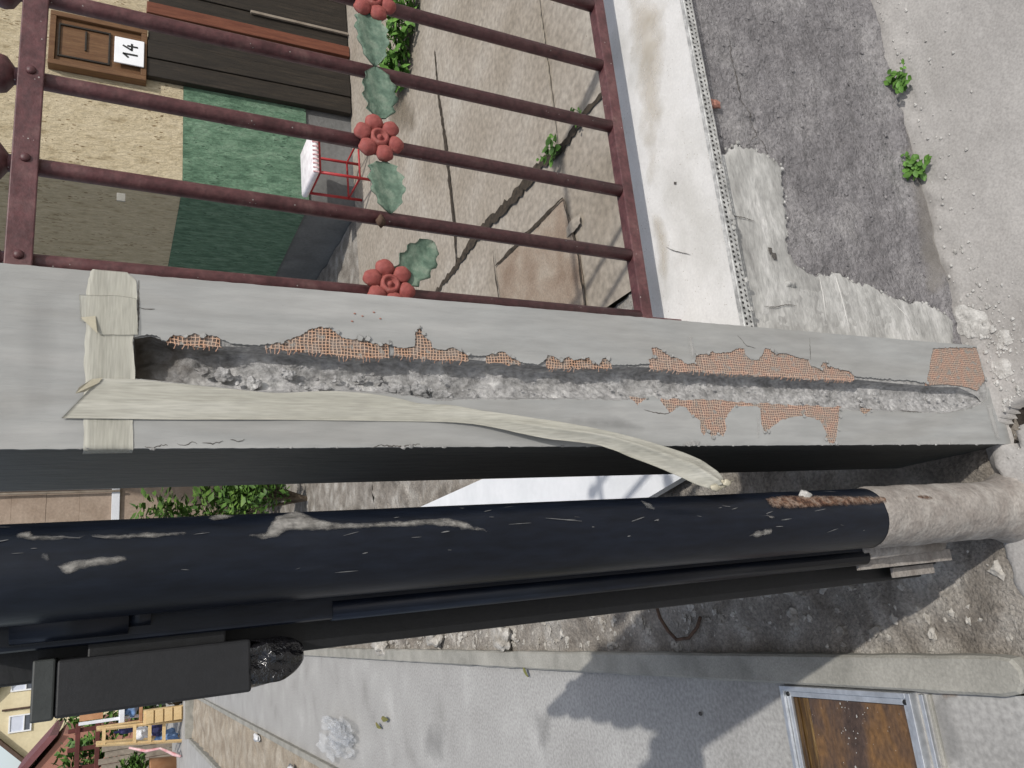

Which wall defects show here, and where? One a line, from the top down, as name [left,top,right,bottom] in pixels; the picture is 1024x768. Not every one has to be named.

crack [434,0,602,291]
spalling [166,331,222,351]
spalling [265,325,470,365]
spalling [486,351,520,366]
spalling [546,355,612,372]
spalling [649,347,854,383]
spalling [925,347,987,390]
spalling [629,396,842,446]